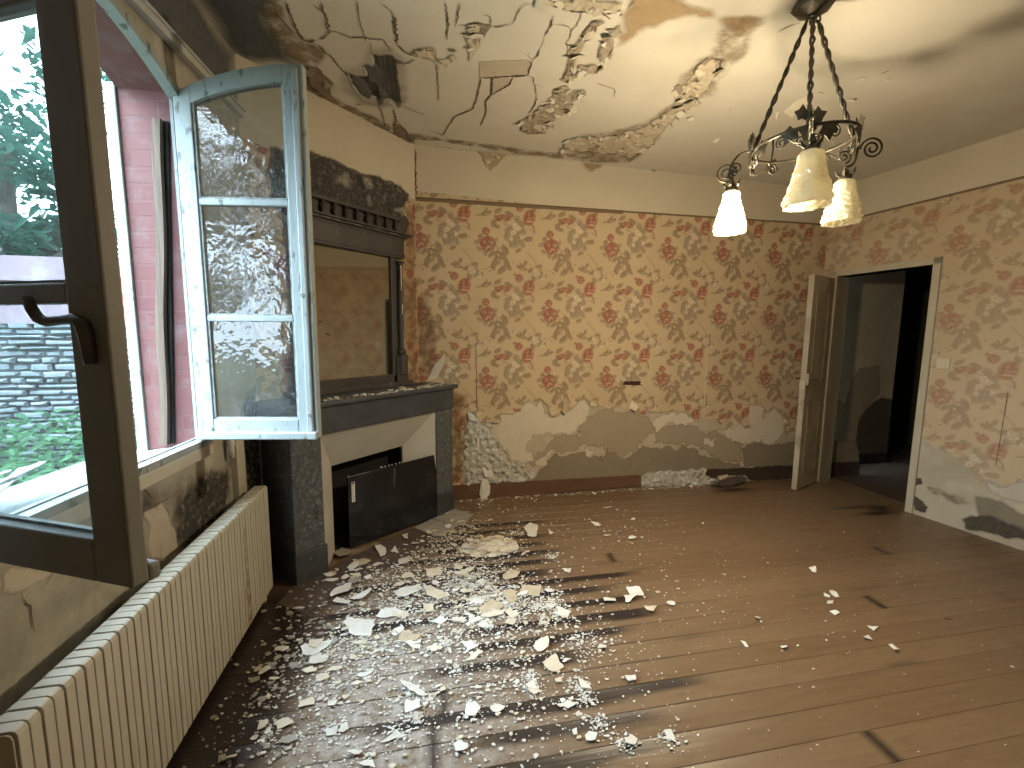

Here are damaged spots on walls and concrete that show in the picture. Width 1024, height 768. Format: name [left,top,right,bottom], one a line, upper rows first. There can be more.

peeling [306,65,333,100]
peeling [393,122,413,141]
crack [272,1,634,195]
peeling [465,23,532,95]
peeling [517,0,623,135]
peeling [558,57,723,158]
water stain [177,473,227,546]
peeling [462,400,590,505]
peeling [652,412,694,432]
spalling [641,468,748,487]
peeling [703,405,785,447]
spalling [914,478,927,513]